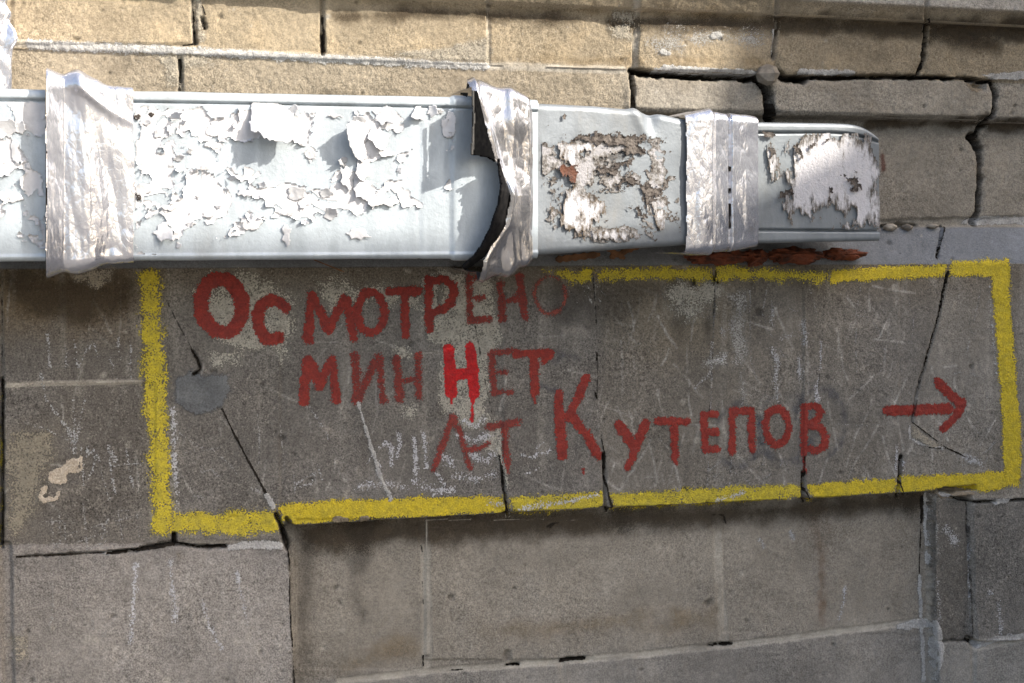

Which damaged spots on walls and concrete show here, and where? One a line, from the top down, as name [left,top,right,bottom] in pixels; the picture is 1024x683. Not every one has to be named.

peeling [133,112,154,125]
peeling [166,112,186,135]
peeling [172,122,224,173]
peeling [232,102,302,143]
peeling [275,106,402,221]
peeling [0,190,24,203]
peeling [153,204,181,248]
peeling [186,175,266,227]
crack [912,215,973,459]
crack [1,300,227,558]
crack [484,380,510,512]
crack [221,408,295,683]